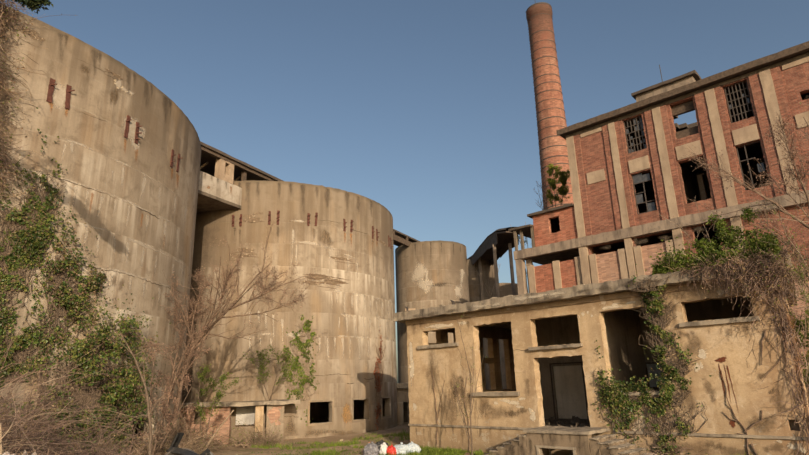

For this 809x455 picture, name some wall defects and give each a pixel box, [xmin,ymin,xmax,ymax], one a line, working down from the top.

rust [715,357,737,404]